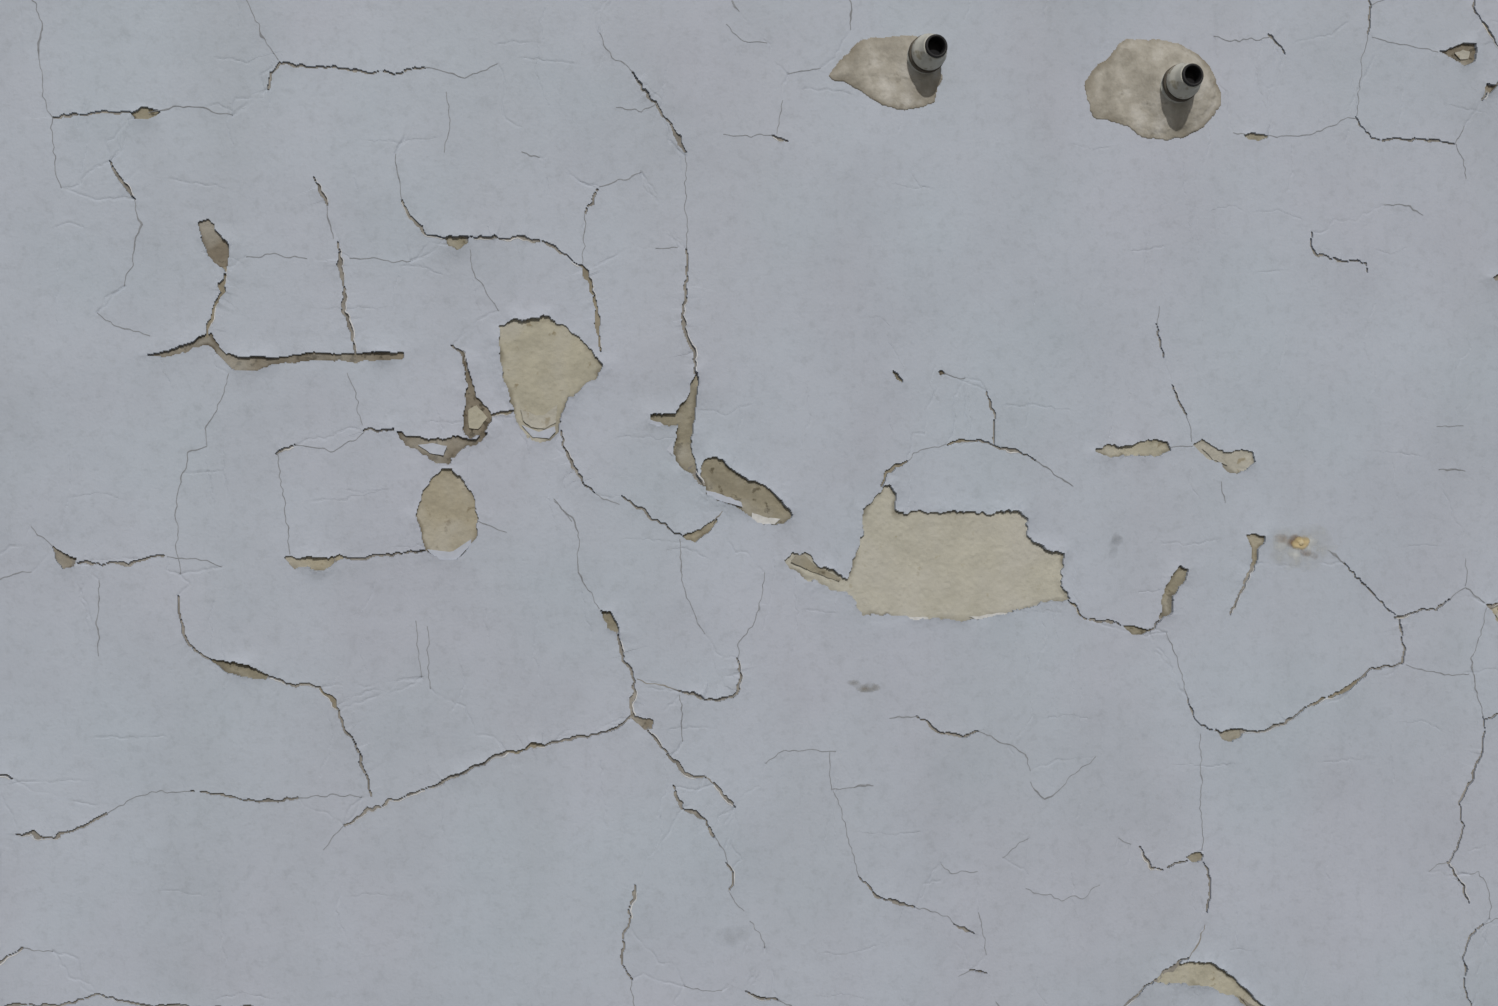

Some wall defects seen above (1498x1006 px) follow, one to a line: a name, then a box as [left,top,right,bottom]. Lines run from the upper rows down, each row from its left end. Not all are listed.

crack [32,0,232,188]
crack [246,0,498,153]
crack [1233,0,1498,179]
peeling [1439,44,1475,65]
crack [599,32,698,374]
crack [0,154,765,948]
peeling [364,315,620,559]
peeling [650,374,792,525]
peeling [784,484,1069,622]
peeling [1095,439,1255,503]
crack [1070,550,1498,1006]
peeling [1124,957,1263,1006]